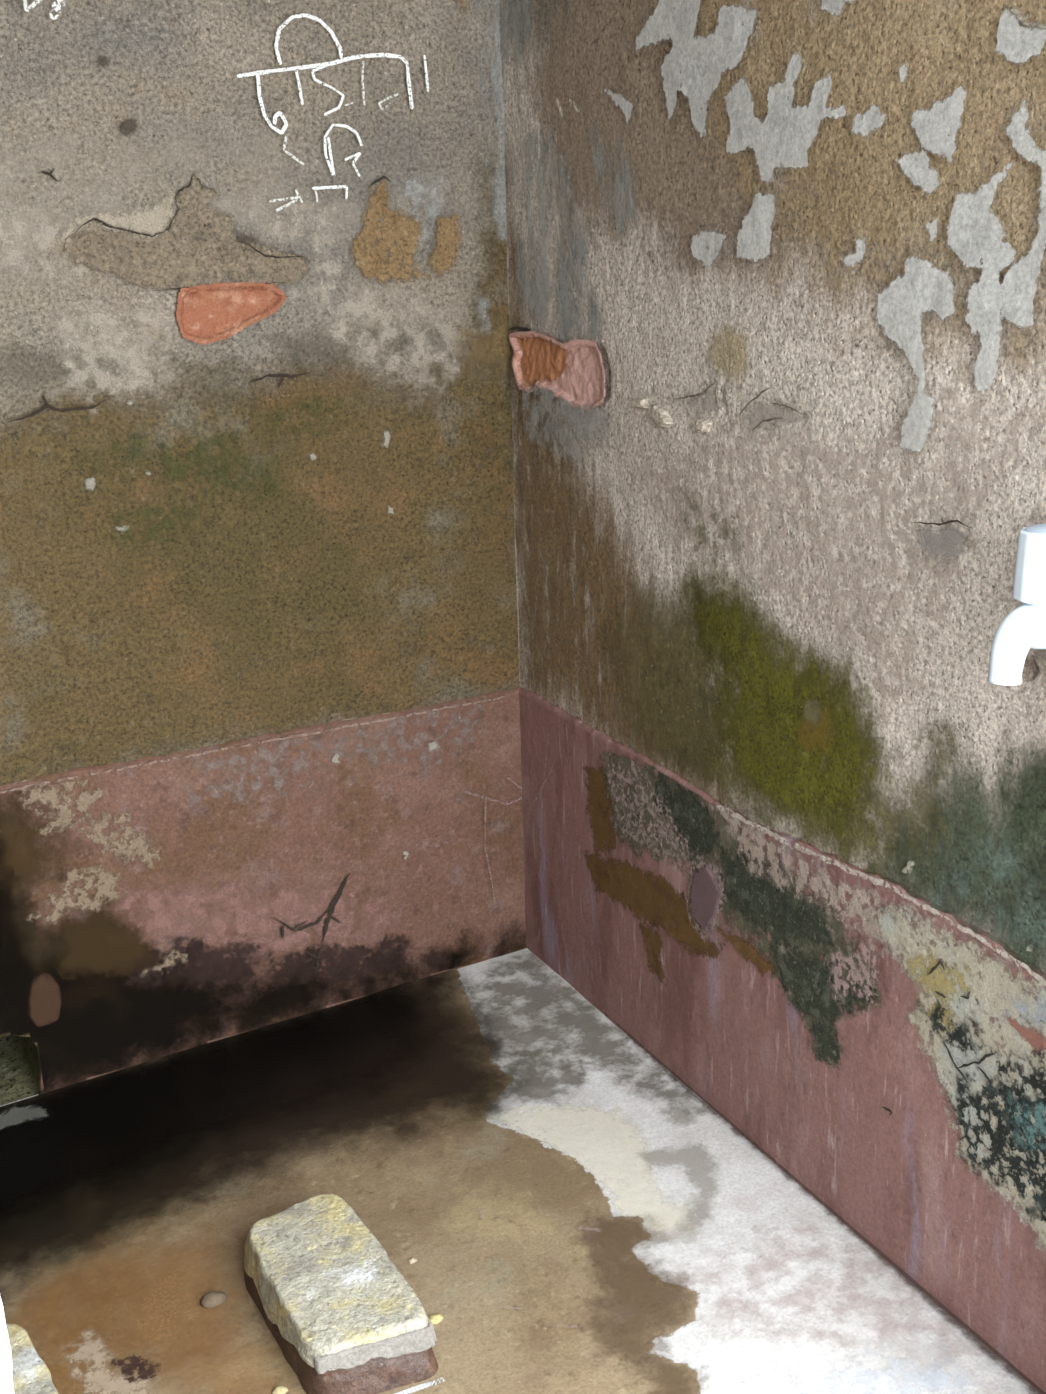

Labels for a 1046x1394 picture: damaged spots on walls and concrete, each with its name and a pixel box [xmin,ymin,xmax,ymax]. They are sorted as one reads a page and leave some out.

flaking render [604,88,633,123]
flaking render [635,0,886,268]
flaking render [996,7,1046,63]
spalling [60,174,310,345]
spalling [350,174,462,283]
flaking render [876,86,1046,452]
flaking render [508,326,610,462]
spalling [629,377,718,433]
damp [0,0,1046,1067]
crack [275,873,351,970]
flaking render [831,904,1046,1250]
damp [917,991,1046,1222]